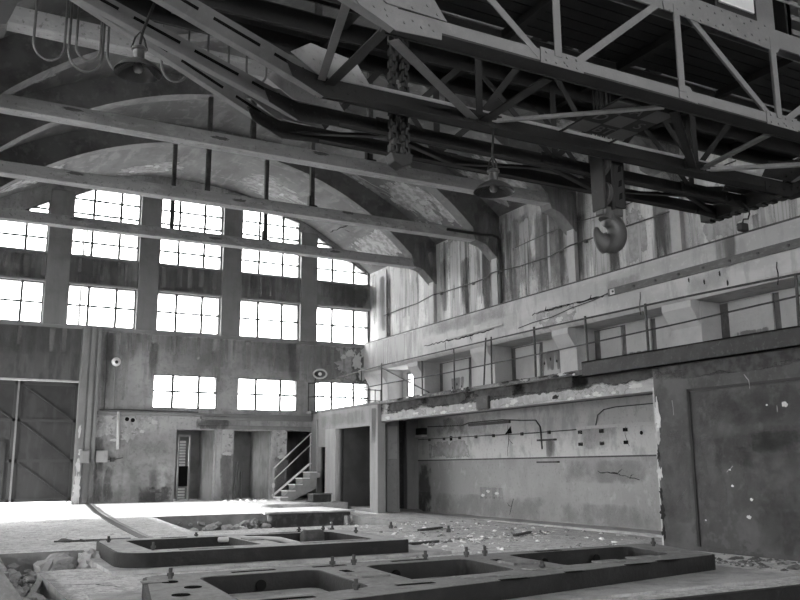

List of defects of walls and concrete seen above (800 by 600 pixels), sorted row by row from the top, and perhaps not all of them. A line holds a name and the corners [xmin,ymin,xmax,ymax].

water stain [439,240,489,315]
water stain [501,213,566,301]
water stain [577,193,667,274]
peeling [334,347,366,384]
peeling [385,383,642,420]
spalling [654,396,666,541]